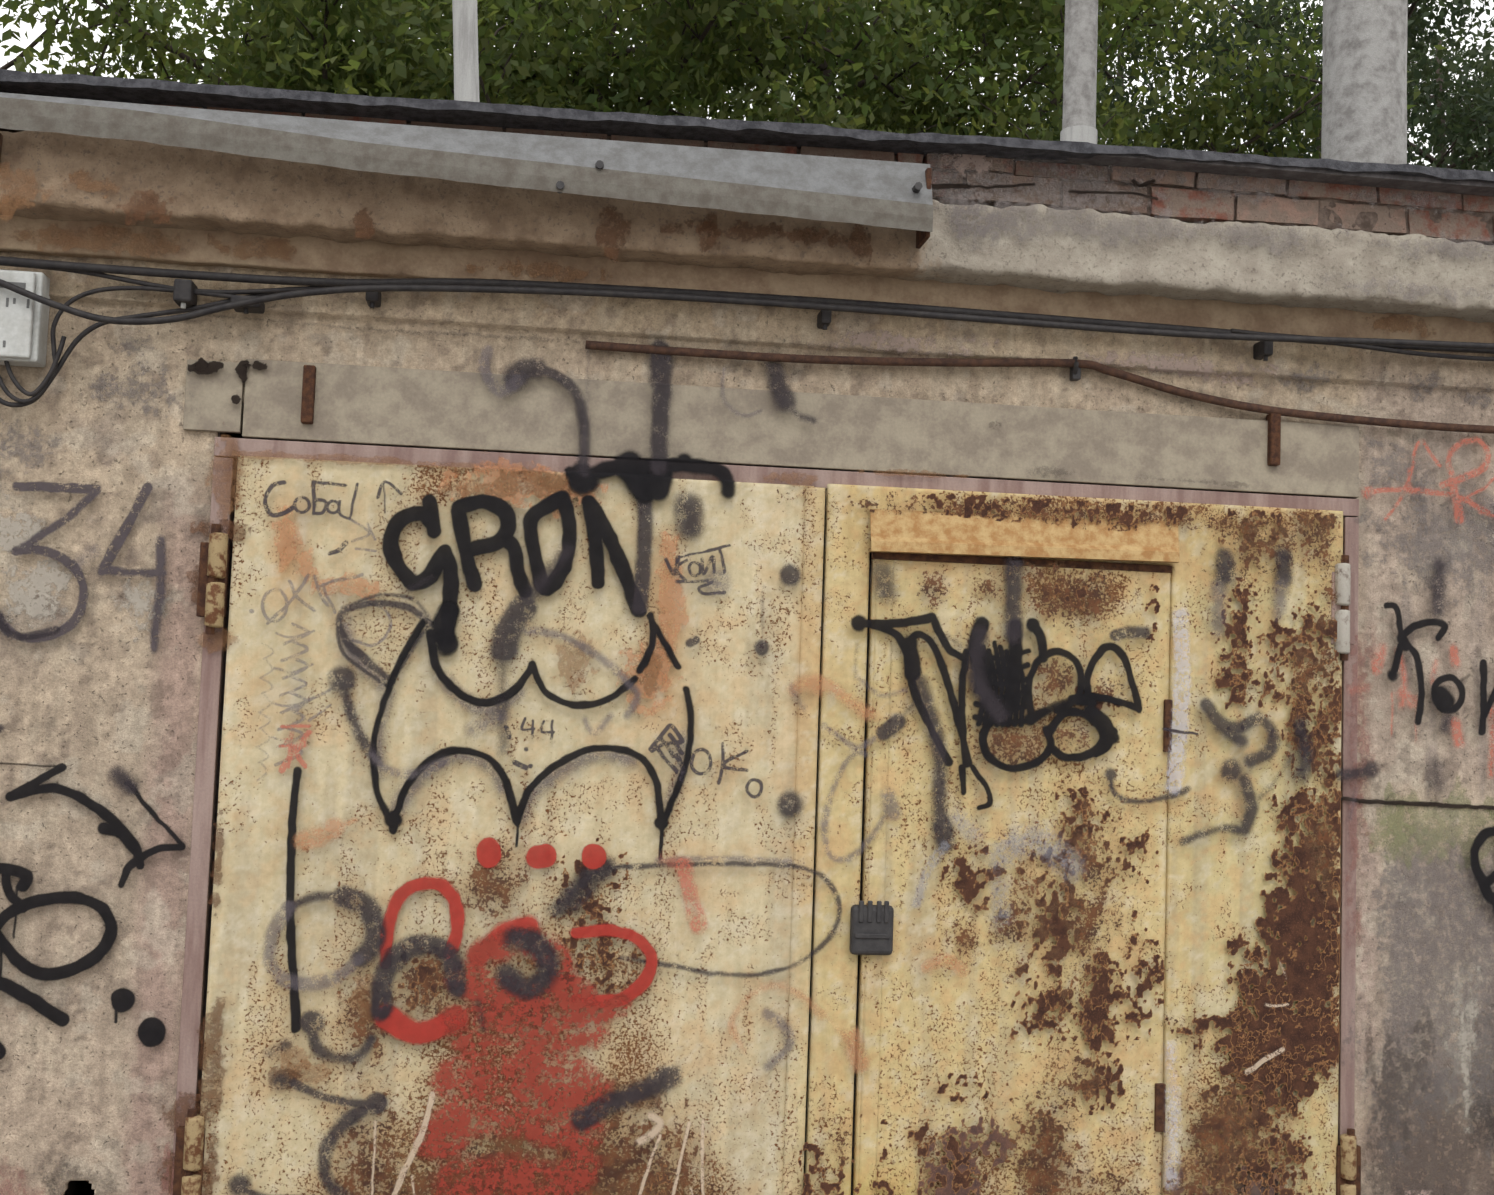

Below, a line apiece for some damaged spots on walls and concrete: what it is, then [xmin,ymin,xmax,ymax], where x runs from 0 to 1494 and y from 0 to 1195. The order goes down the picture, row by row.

corrosion [208,810,224,916]
corrosion [777,489,1342,1195]
corrosion [162,998,225,1195]
corrosion [268,1067,302,1089]
corrosion [311,839,740,1195]
leakage [1444,983,1478,1133]